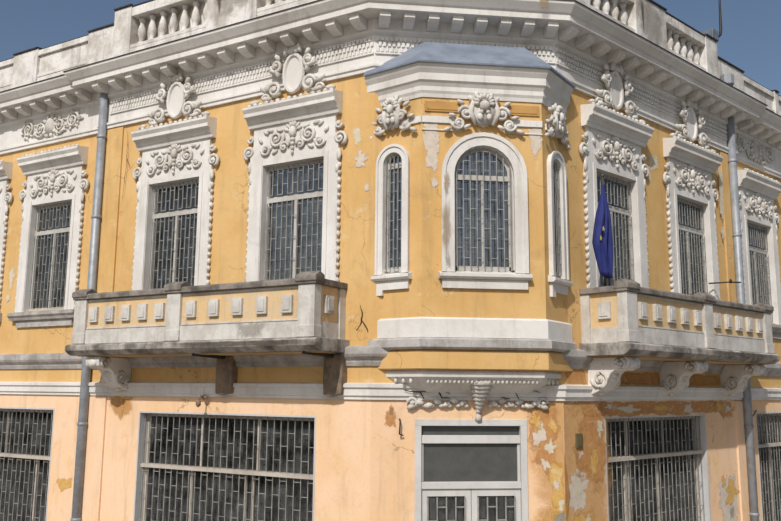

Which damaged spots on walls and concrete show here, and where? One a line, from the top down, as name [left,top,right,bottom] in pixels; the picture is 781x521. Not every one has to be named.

peeling [529,408,594,521]
peeling [719,475,740,521]